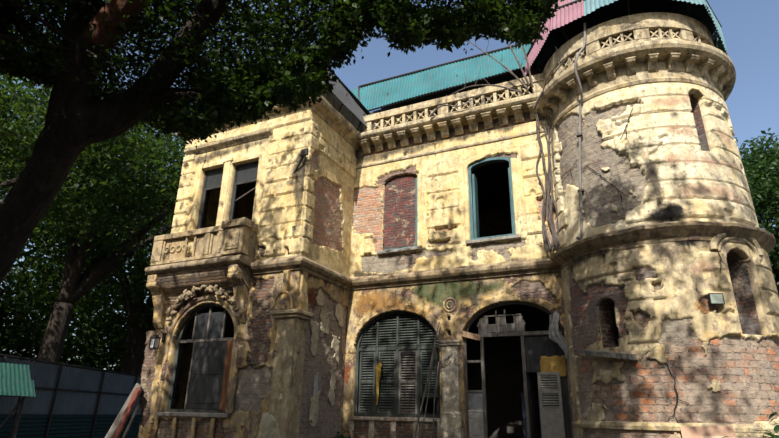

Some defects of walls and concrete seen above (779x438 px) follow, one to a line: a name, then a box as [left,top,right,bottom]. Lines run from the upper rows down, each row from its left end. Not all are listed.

spalling [139,331,226,438]
spalling [233,277,274,413]
spalling [298,288,347,438]
spalling [311,151,457,274]
leakage [414,281,501,307]
spalling [471,239,525,262]
spalling [537,197,557,251]
spalling [557,101,648,228]
spalling [634,266,663,292]
leakage [647,163,684,223]
spalling [569,272,779,438]
crack [664,363,688,423]